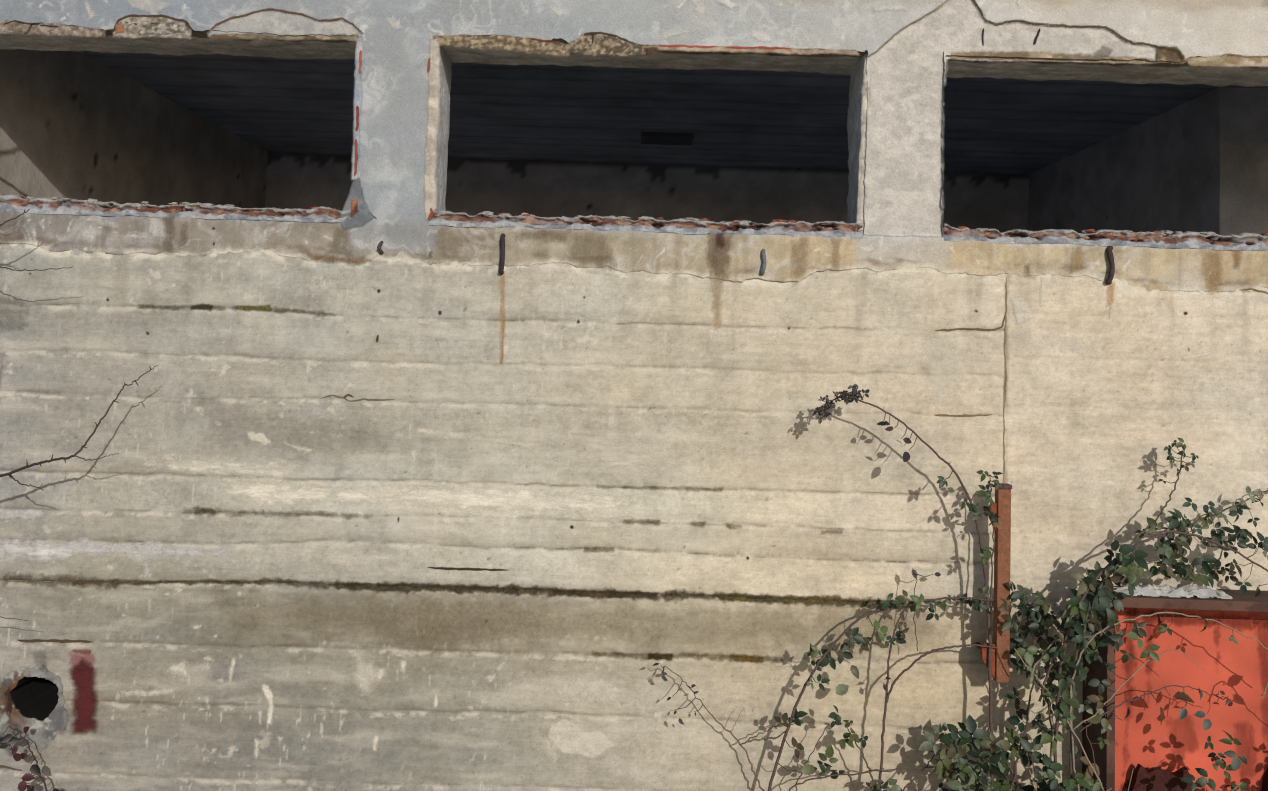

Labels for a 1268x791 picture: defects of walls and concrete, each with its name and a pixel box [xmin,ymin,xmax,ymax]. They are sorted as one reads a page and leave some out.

peeling [208,8,377,229]
peeling [424,0,1268,237]
water stain [713,234,728,326]
crack [935,277,1007,483]